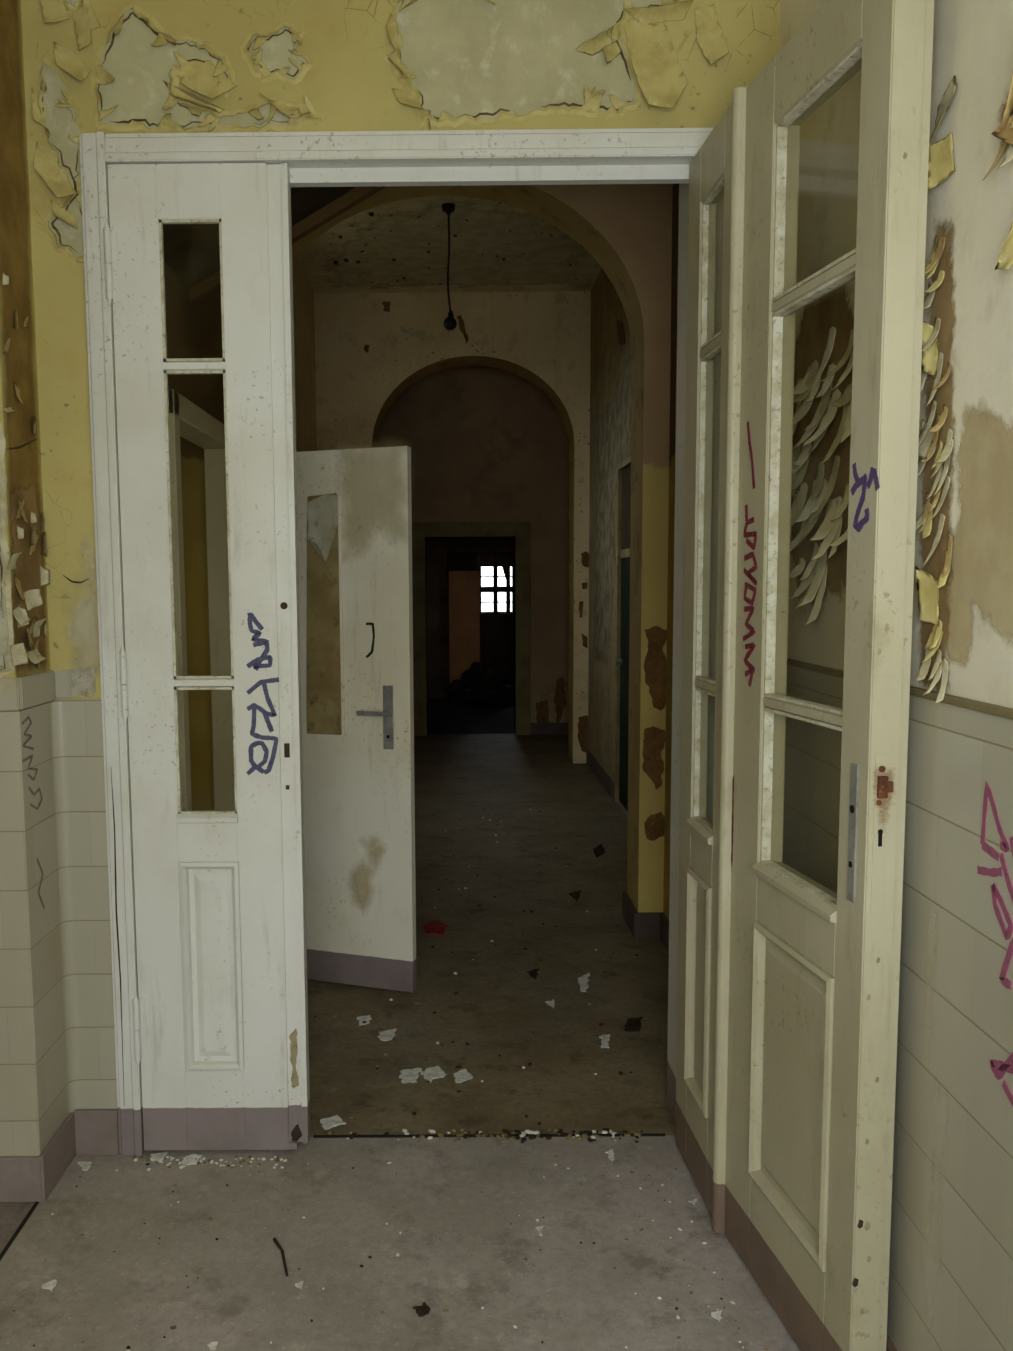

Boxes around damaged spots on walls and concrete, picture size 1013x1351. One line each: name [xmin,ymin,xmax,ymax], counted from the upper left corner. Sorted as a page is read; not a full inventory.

peeling [384,0,730,131]
peeling [31,4,327,266]
peeling [928,75,957,190]
peeling [983,72,1013,180]
peeling [994,222,1013,270]
peeling [915,223,956,704]
flaking render [0,381,50,678]
peeling [644,626,667,711]
peeling [642,726,666,789]
peeling [644,812,665,841]